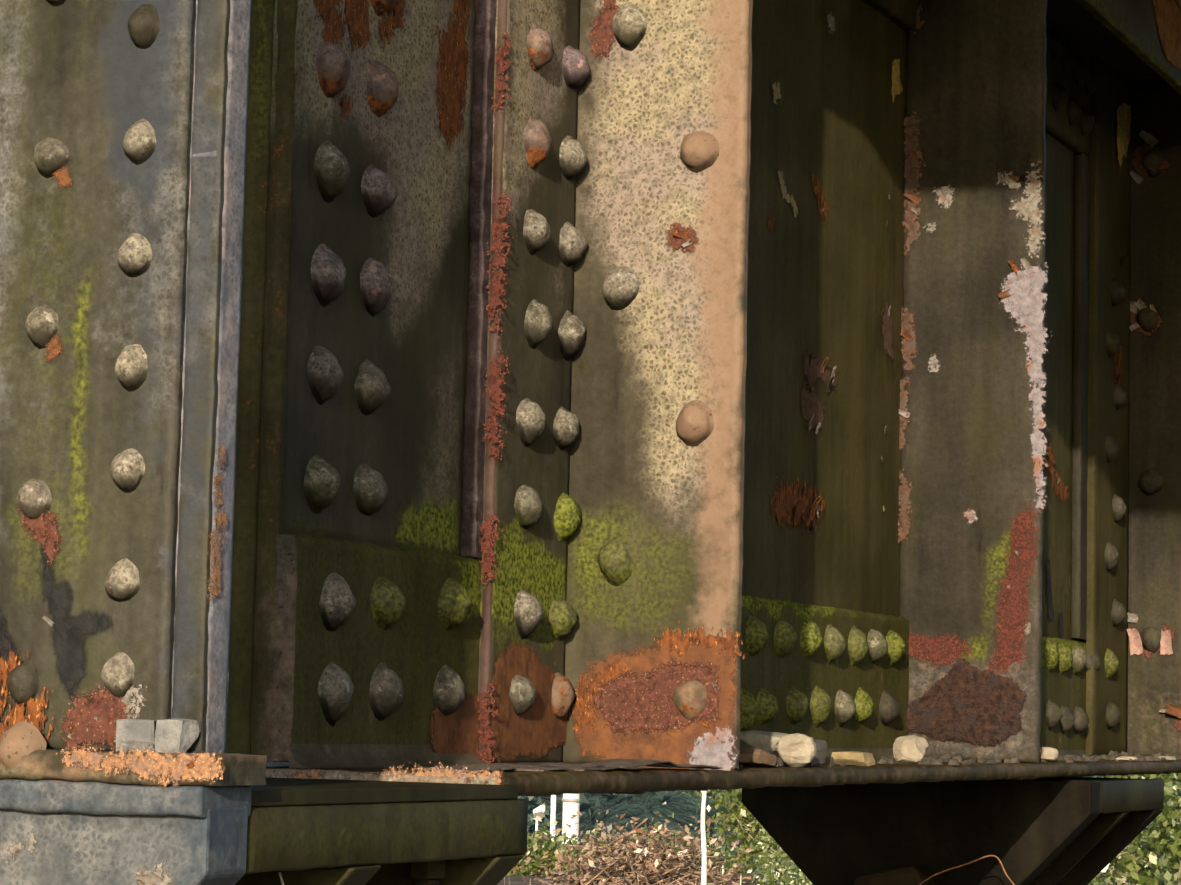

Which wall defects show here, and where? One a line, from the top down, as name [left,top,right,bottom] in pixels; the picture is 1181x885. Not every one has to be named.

corrosion [434,0,471,151]
corrosion [588,0,620,60]
corrosion [666,219,699,254]
corrosion [483,189,513,465]
peeling [800,352,839,434]
peeling [993,161,1070,512]
damp [40,537,111,700]
corrosion [479,513,504,588]
corrosion [907,502,1040,747]
corrosion [0,646,224,787]
corrosion [370,621,745,785]
peeling [135,859,174,885]